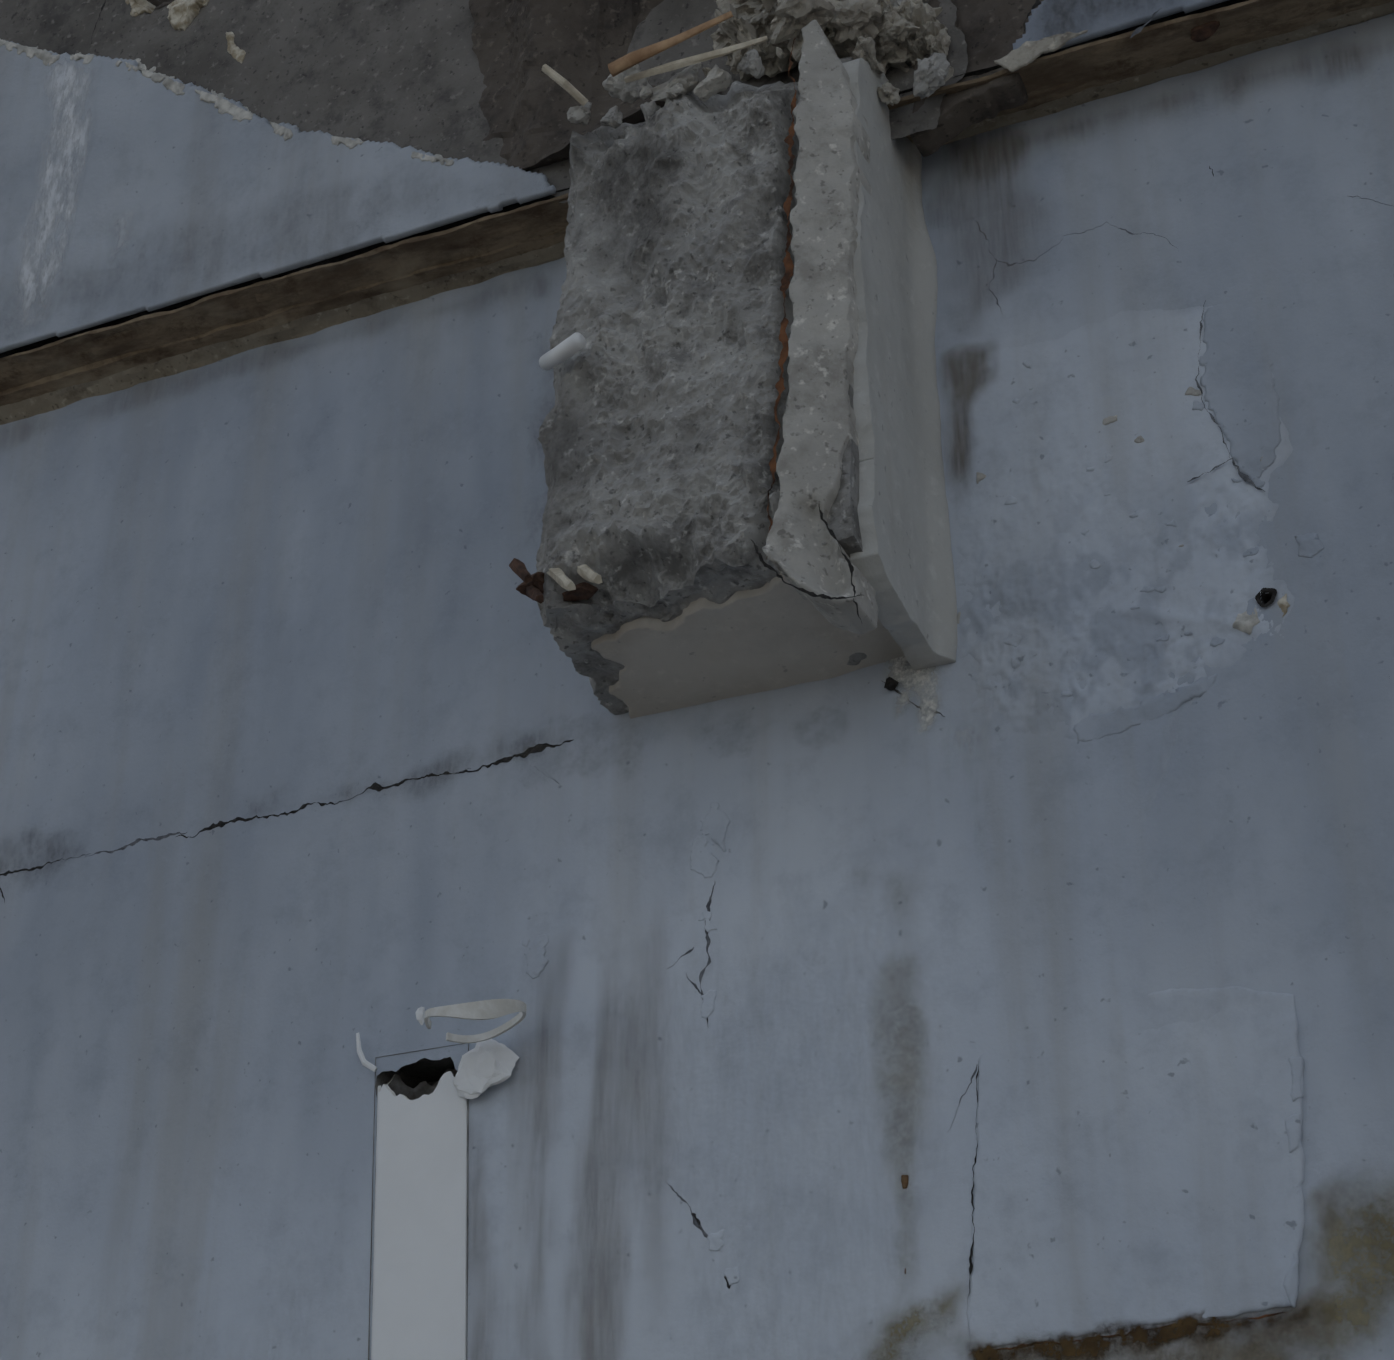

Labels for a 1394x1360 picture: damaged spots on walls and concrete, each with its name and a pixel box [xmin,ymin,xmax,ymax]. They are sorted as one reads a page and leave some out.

spalling [0,0,800,203]
spalling [885,0,1088,157]
rust [516,572,545,601]
rust [562,582,598,602]
crack [0,740,573,903]
crack [667,884,715,1028]
rust [877,1310,923,1360]
rust [971,1307,1333,1360]